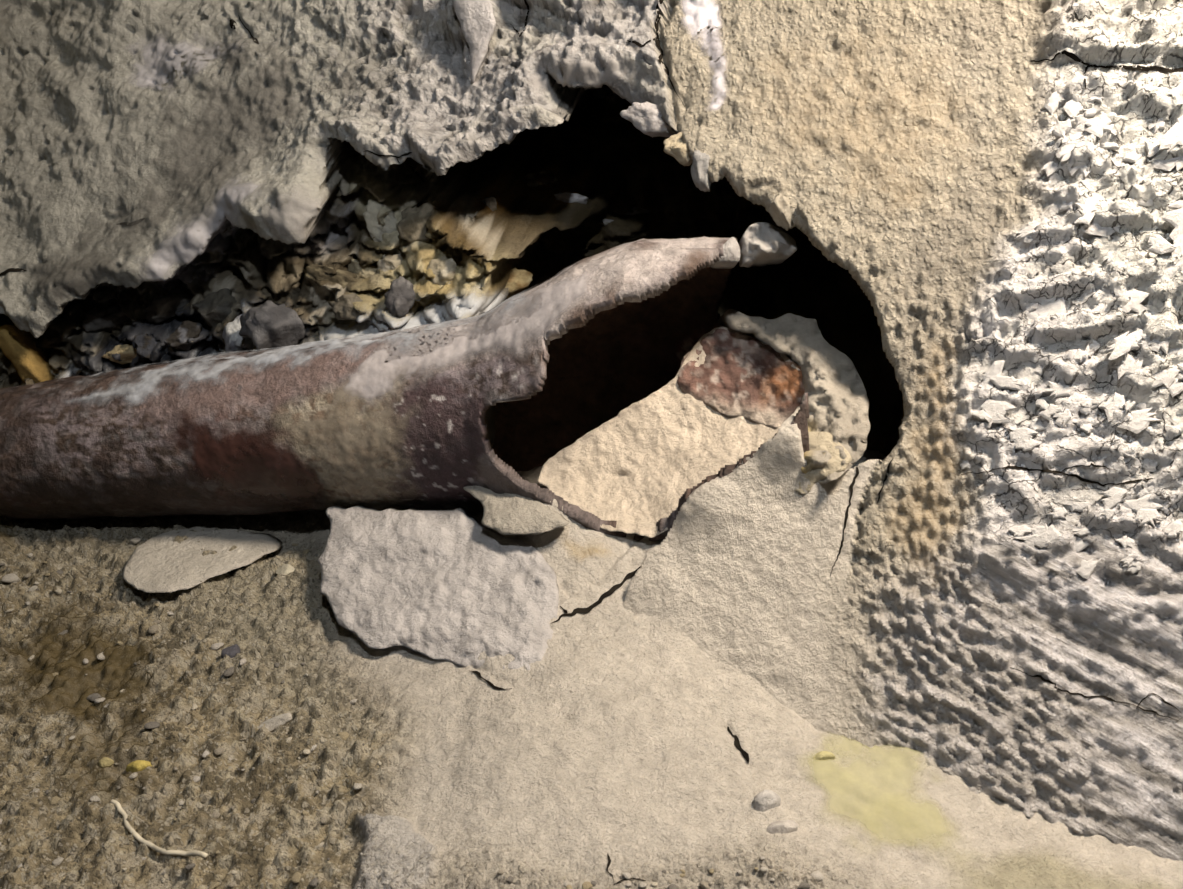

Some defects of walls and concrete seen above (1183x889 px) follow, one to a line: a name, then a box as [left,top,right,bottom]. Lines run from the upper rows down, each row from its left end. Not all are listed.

leakage [683,0,726,109]
crack [1031,50,1183,89]
peeling [1040,91,1183,178]
spalling [34,137,424,379]
spalling [711,237,740,269]
peeling [1059,196,1120,237]
peeling [1113,193,1183,313]
peeling [1026,297,1075,333]
peeling [971,328,1183,452]
corrosion [178,413,331,510]
peeling [463,486,569,535]
peeling [1008,447,1183,579]